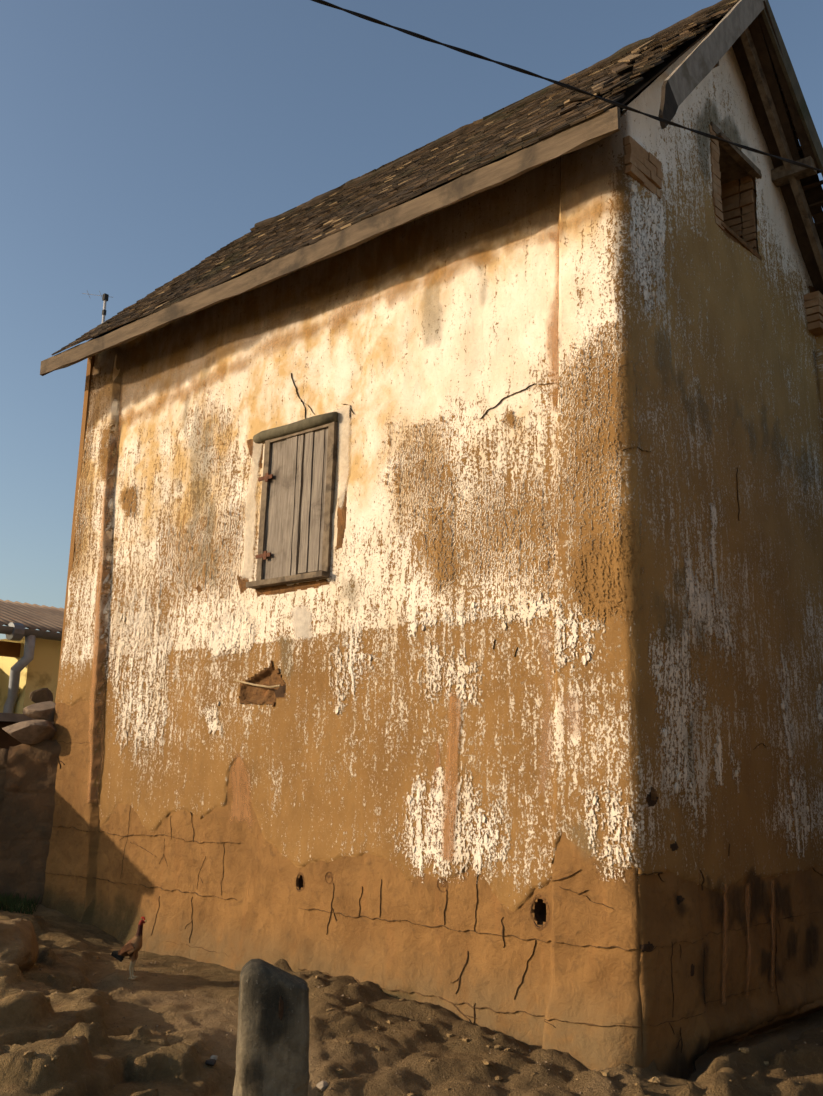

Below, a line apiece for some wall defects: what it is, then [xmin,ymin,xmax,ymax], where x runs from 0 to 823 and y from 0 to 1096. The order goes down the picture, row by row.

peeling [617,175,667,312]
crack [291,373,315,419]
crack [479,383,557,419]
peeling [121,486,138,521]
flaking render [336,488,347,550]
peeling [376,321,651,706]
peeling [105,497,330,755]
peeling [327,622,383,726]
peeling [577,503,742,882]
crack [45,808,237,954]
peeling [391,767,512,893]
crack [299,870,780,1053]